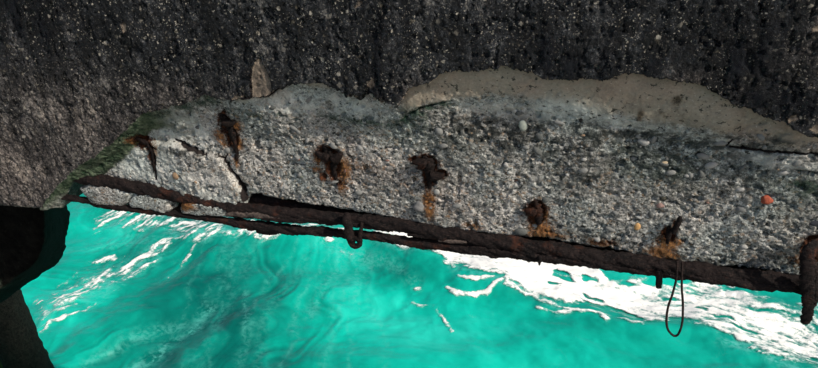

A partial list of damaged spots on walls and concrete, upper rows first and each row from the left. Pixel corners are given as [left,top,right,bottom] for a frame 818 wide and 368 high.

corrosion [126,135,157,166]
crack [176,139,250,202]
corrosion [214,107,243,166]
corrosion [312,145,352,195]
corrosion [408,153,449,220]
spalling [40,59,818,275]
corrosion [225,211,277,219]
corrosion [521,199,565,239]
corrosion [645,219,682,259]